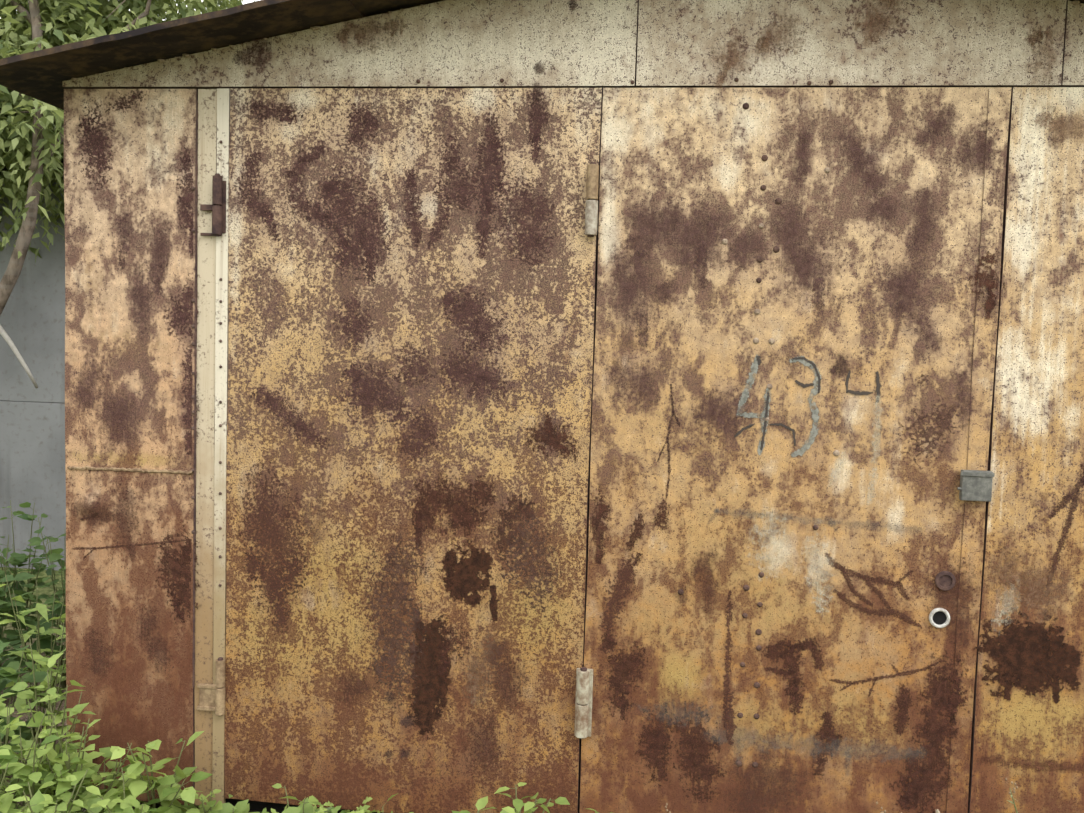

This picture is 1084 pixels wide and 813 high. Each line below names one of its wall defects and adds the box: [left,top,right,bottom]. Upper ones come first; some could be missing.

corrosion [78,88,146,190]
corrosion [114,147,200,455]
corrosion [234,63,557,561]
corrosion [969,251,1006,319]
corrosion [524,413,581,462]
corrosion [898,371,973,463]
corrosion [154,523,200,623]
corrosion [237,456,325,637]
corrosion [585,487,612,564]
corrosion [598,499,737,803]
corrosion [762,636,824,715]
corrosion [889,563,975,813]